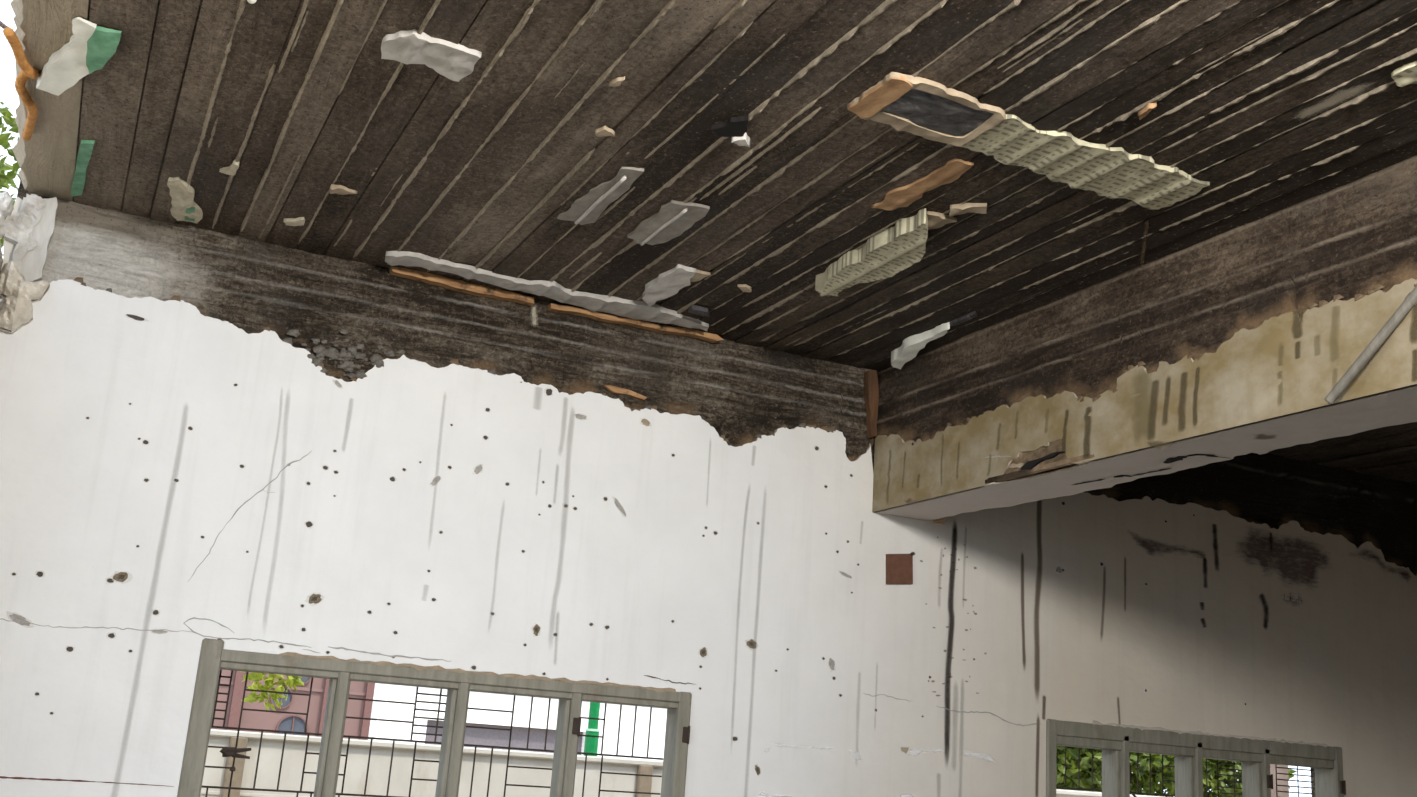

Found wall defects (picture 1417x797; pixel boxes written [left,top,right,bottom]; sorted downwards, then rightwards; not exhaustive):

peeling [731,132,751,147]
spalling [42,155,1417,461]
spalling [985,439,1094,484]
crack [0,617,449,662]
crack [189,452,310,580]
water stain [928,525,979,757]
water stain [1134,524,1219,628]
spalling [1084,453,1417,576]
water stain [1260,594,1268,629]
water stain [1241,531,1327,602]